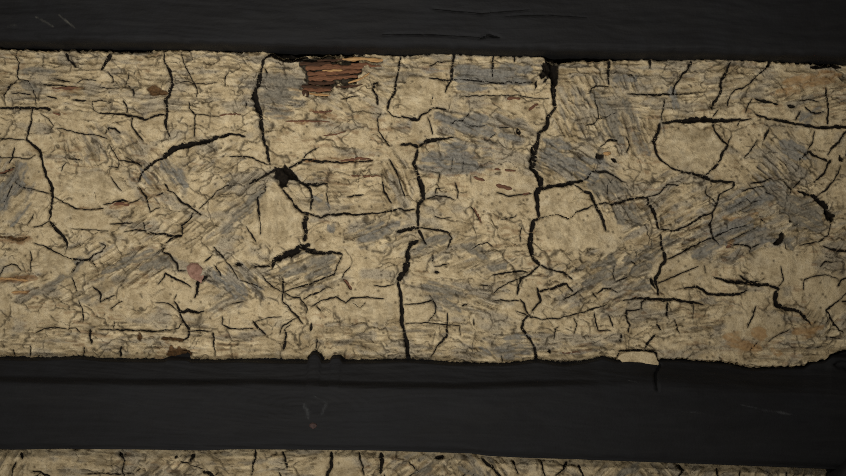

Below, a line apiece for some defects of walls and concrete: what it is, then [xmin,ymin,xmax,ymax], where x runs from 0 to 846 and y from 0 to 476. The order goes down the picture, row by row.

spalling [273,55,383,97]
crack [0,34,846,391]
crack [11,452,50,476]
crack [88,452,141,476]
crack [175,454,218,476]
crack [325,452,333,476]
crack [359,453,385,476]
crack [463,458,518,476]
crack [540,461,584,476]